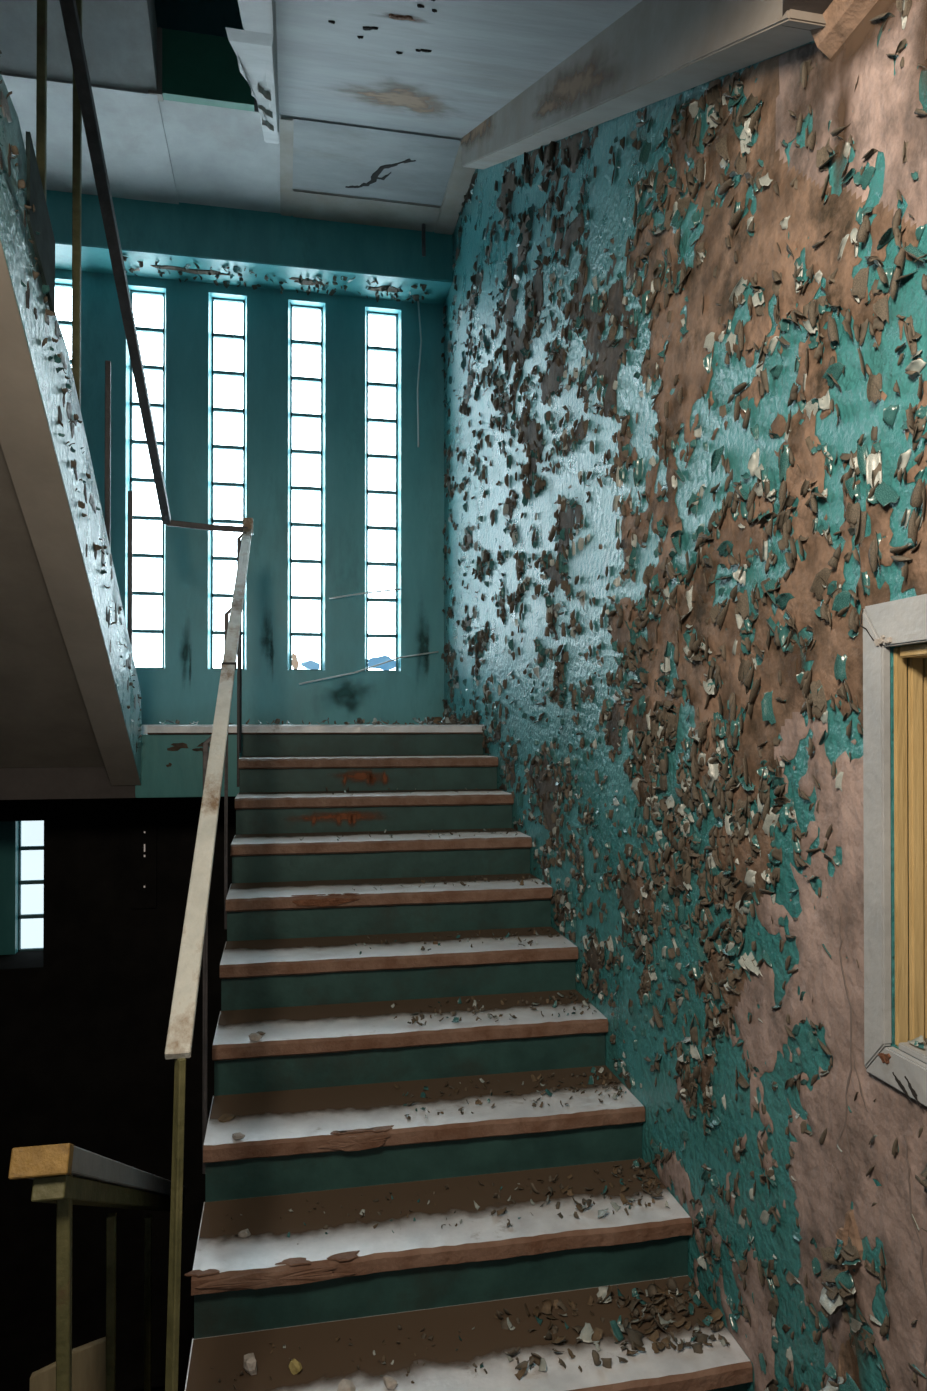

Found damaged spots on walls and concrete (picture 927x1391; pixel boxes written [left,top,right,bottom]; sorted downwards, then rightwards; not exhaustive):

crack [345,159,416,188]
leakage [355,88,440,113]
peeling [0,143,100,517]
peeling [86,538,142,753]
peeling [441,0,927,1391]